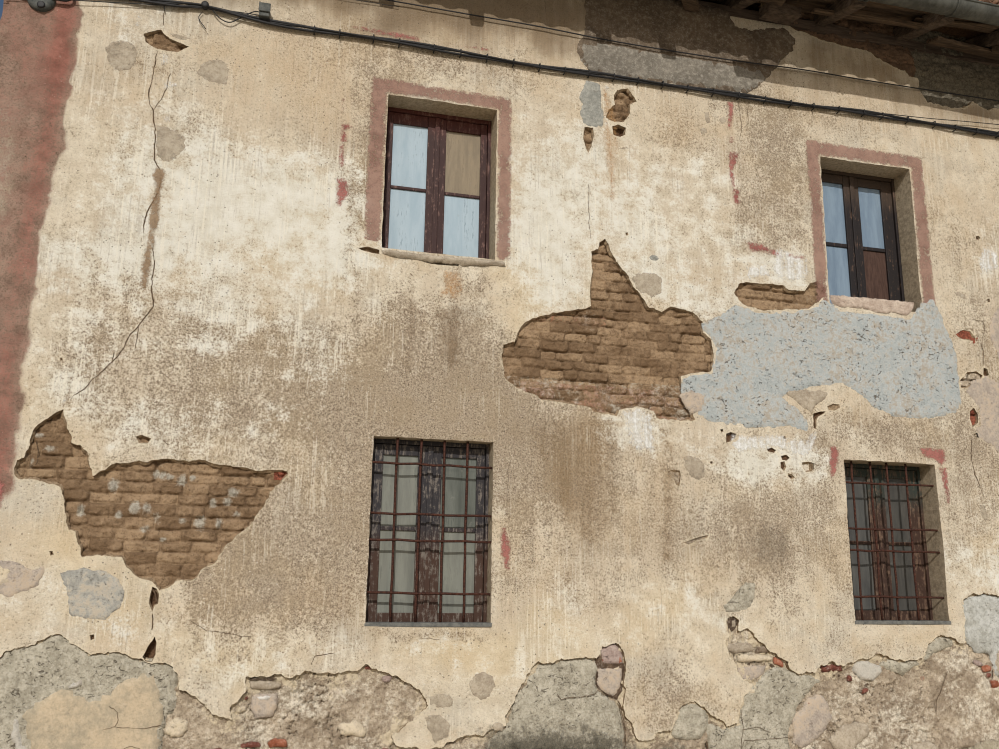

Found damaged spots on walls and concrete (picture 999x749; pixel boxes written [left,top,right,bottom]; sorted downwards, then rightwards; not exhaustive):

spalling [144,30,189,52]
spalling [787,12,999,110]
spalling [583,127,594,152]
spalling [606,88,637,149]
crack [69,54,171,402]
spalling [502,239,714,421]
spalling [734,281,826,311]
spalling [14,410,288,611]
spalling [88,637,171,666]
flaking render [162,664,428,749]
flaking render [432,643,744,749]
flaking render [725,616,999,749]